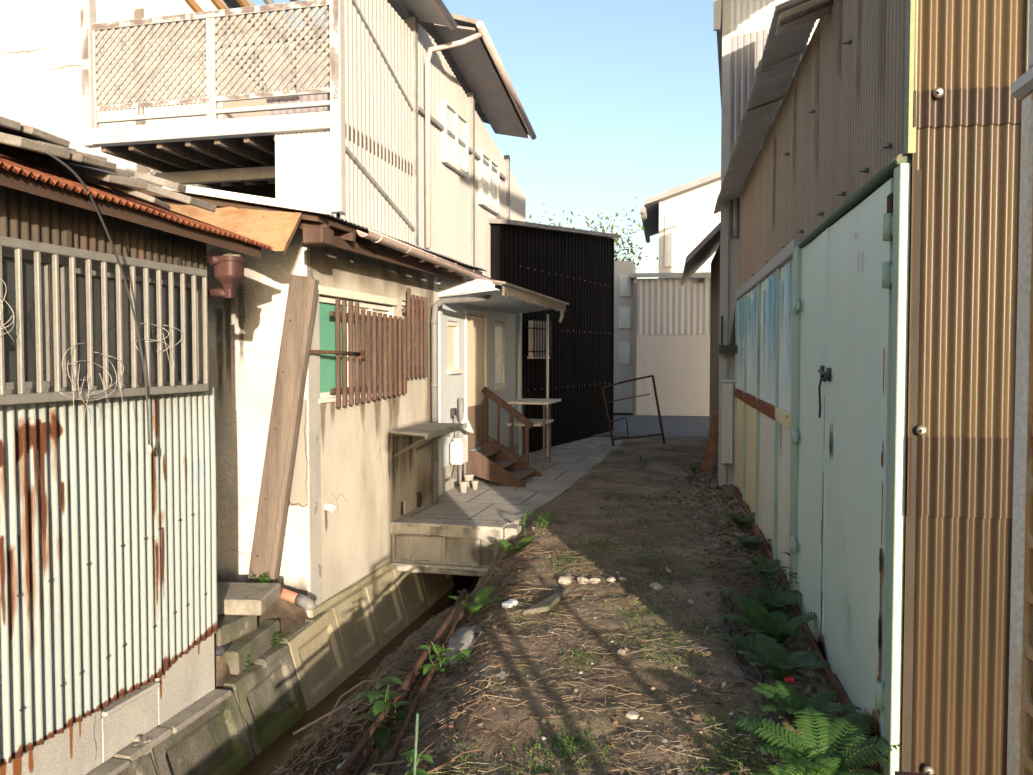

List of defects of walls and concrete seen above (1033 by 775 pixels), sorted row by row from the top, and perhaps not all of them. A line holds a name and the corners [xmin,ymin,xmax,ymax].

leakage [207,245,246,390]
rust [0,412,69,637]
rust [151,399,166,602]
rust [0,622,218,775]
rust [857,708,883,775]